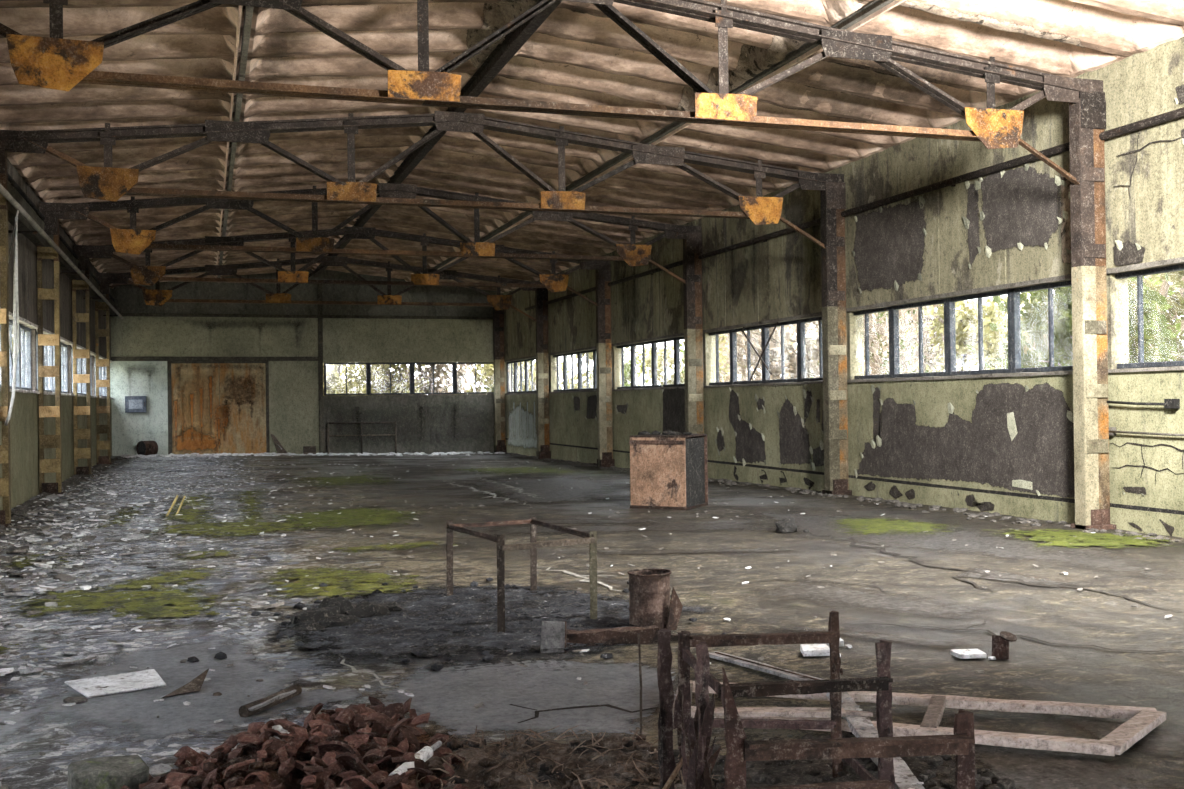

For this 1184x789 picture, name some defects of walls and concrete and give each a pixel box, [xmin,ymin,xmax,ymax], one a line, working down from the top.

peeling [852,196,927,294]
peeling [962,163,1071,269]
rust [174,375,258,452]
peeling [715,387,824,471]
peeling [854,383,1075,512]
crack [1110,442,1184,484]